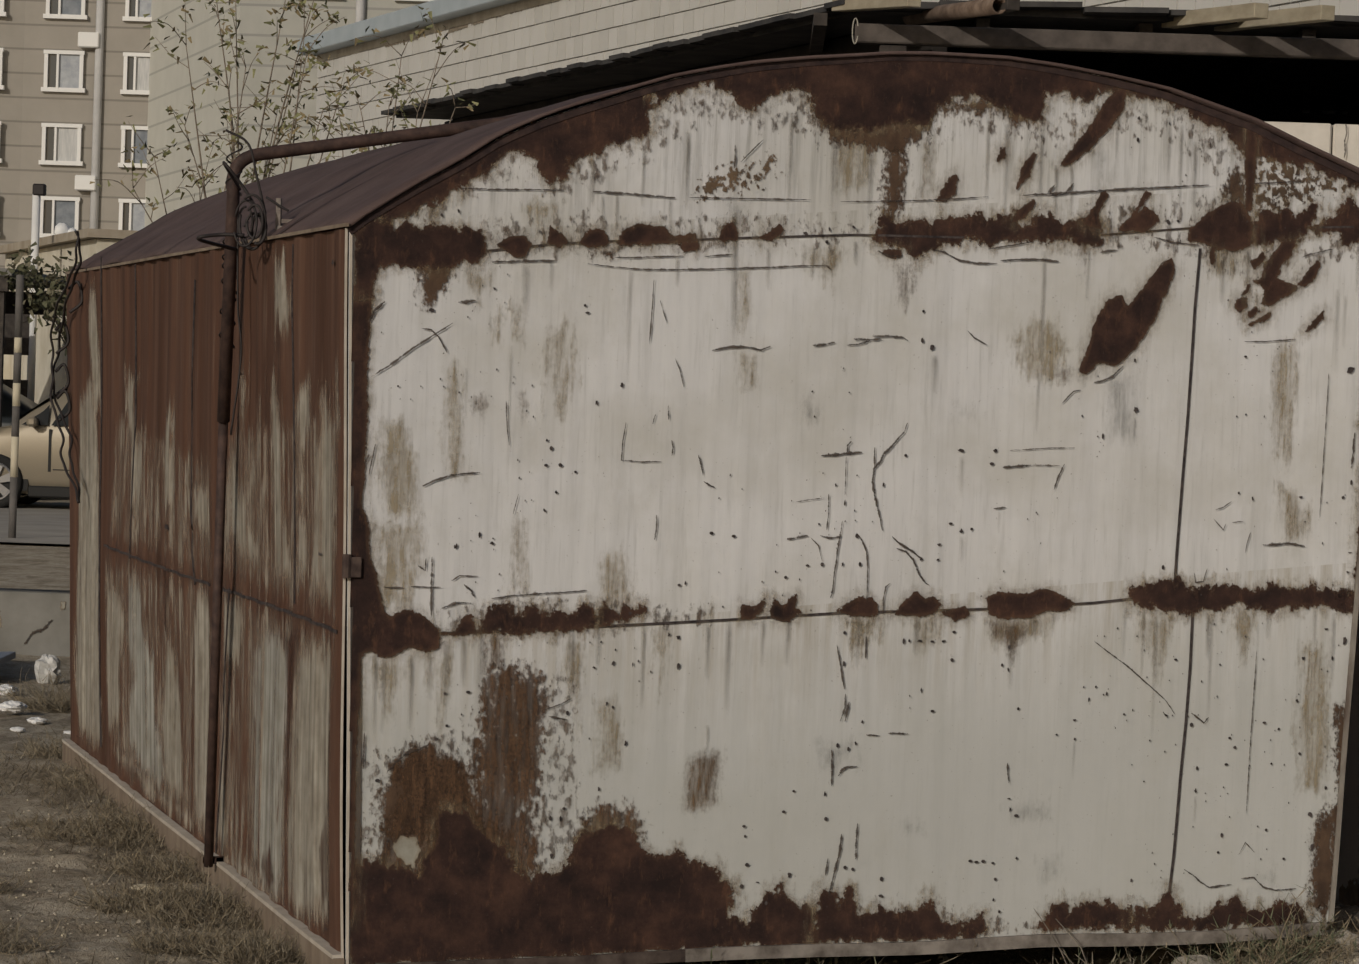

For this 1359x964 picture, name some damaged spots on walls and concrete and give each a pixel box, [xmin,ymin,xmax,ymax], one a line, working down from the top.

rust [348,61,1359,964]
rust [283,632,298,749]
rust [262,848,273,885]
peeling [392,835,421,870]